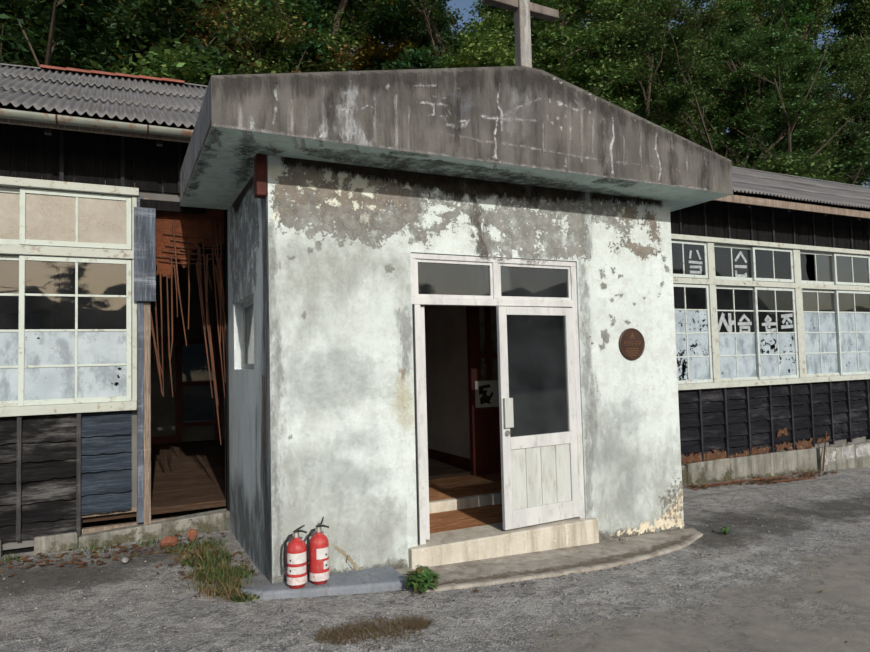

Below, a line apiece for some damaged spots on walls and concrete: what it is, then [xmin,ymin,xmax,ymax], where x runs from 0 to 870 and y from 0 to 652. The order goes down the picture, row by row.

peeling [268,157,670,273]
peeling [600,267,624,302]
damp [213,68,663,582]
peeling [588,314,638,350]
peeling [611,478,684,537]
damp [434,534,695,585]